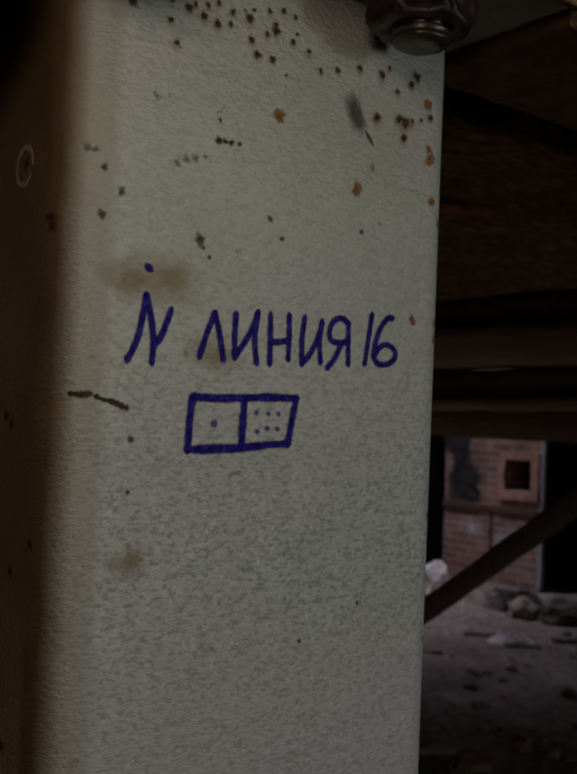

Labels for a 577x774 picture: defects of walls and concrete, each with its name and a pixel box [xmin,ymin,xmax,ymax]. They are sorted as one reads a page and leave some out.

rust [186,0,257,27]
rust [397,101,433,141]